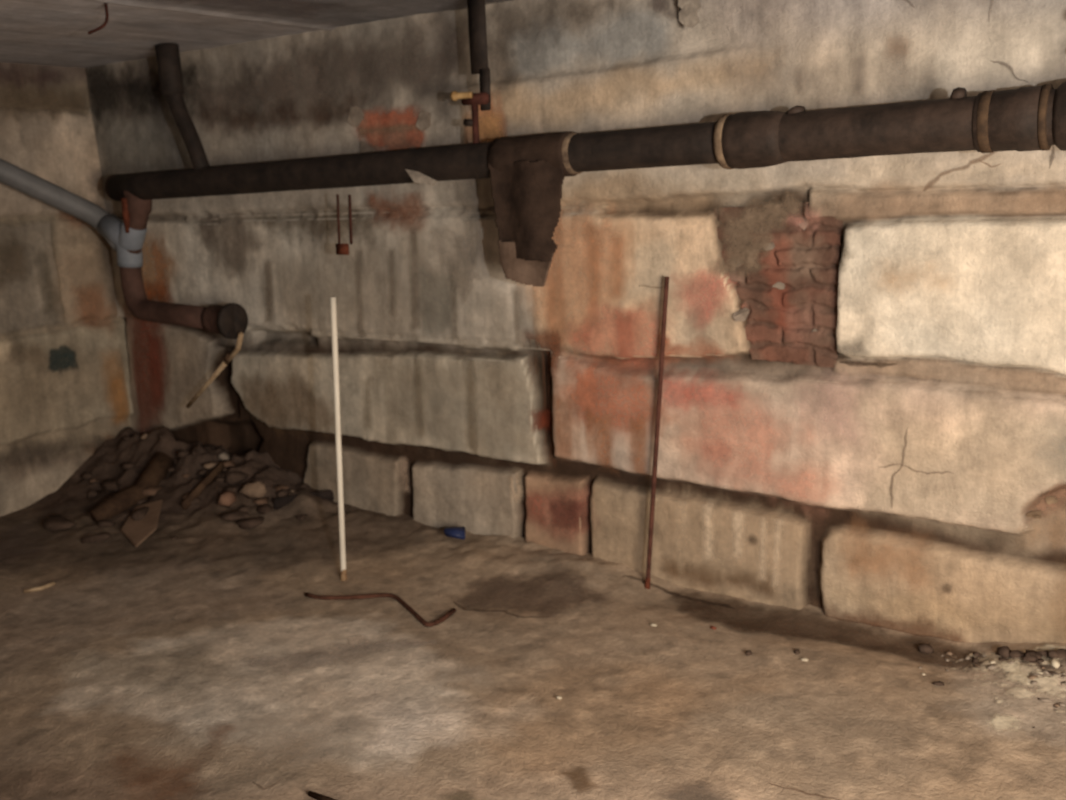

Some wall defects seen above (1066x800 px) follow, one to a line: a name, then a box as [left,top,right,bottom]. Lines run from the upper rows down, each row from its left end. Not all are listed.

rust [126,307,163,433]
rust [142,242,171,302]
rust [527,333,561,451]
rust [574,308,680,366]
spalling [713,193,863,368]
crack [886,432,944,500]
damp [628,576,1066,703]
damp [993,716,1018,729]